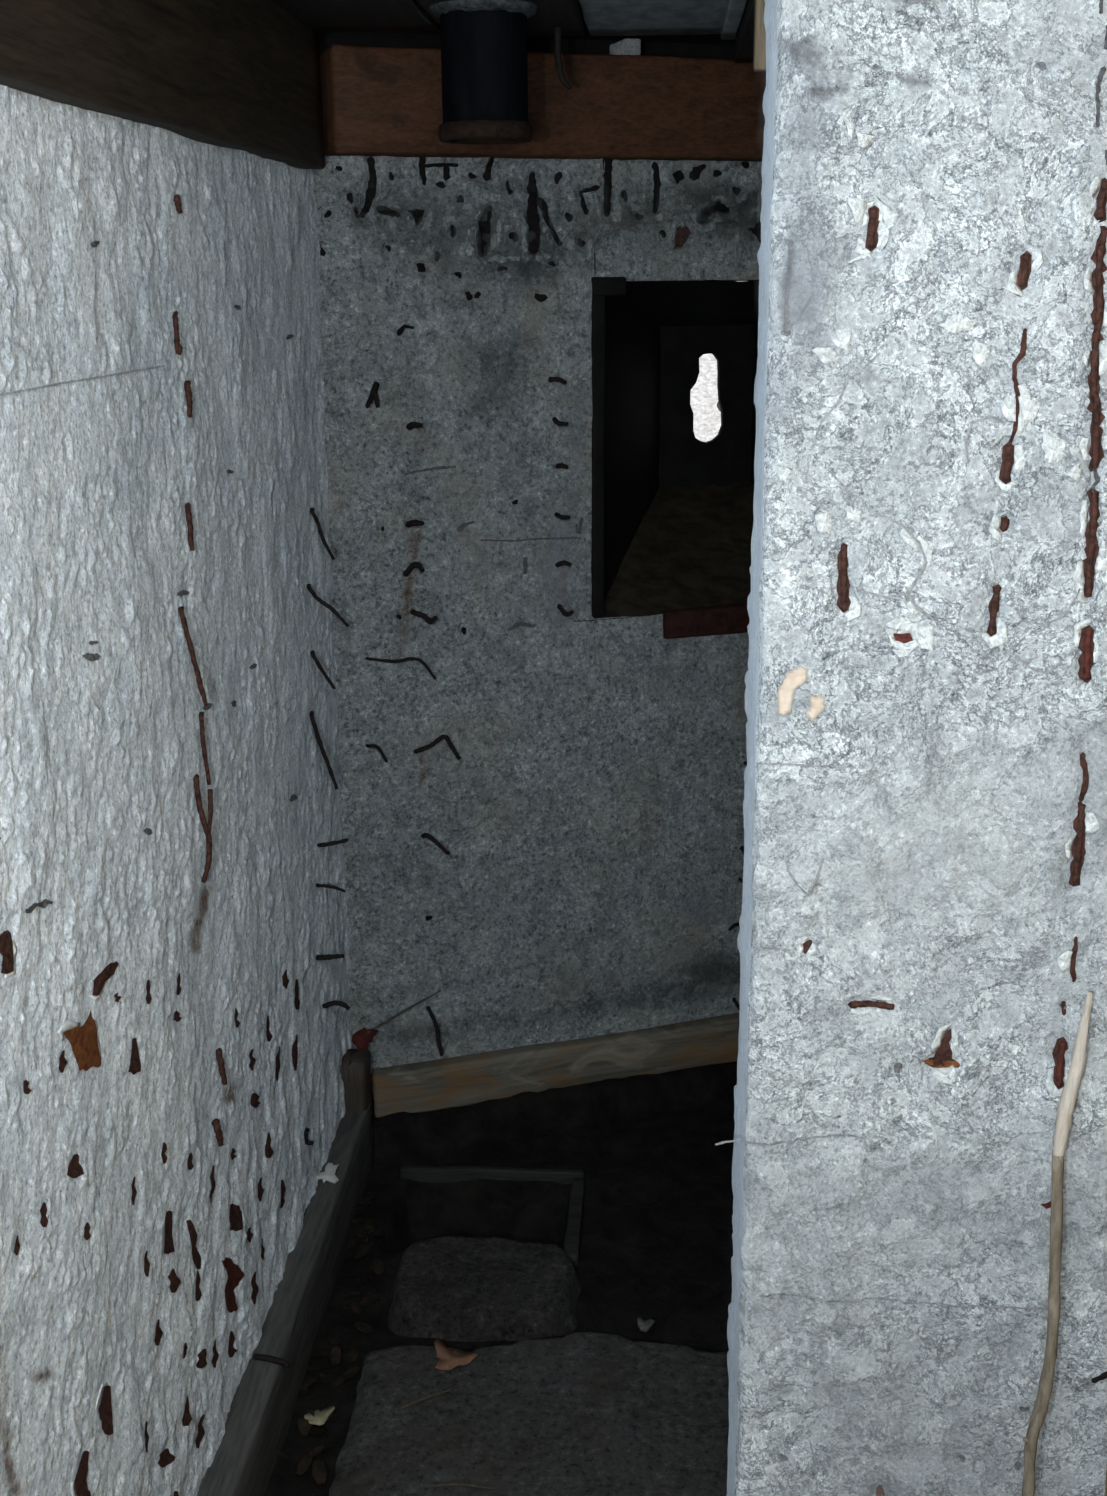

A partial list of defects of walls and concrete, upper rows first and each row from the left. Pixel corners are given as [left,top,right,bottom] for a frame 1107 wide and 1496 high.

peeling [778,667,824,720]
spalling [0,930,17,979]
spalling [58,961,121,1073]
spalling [174,973,182,1022]
spalling [128,1038,141,1075]